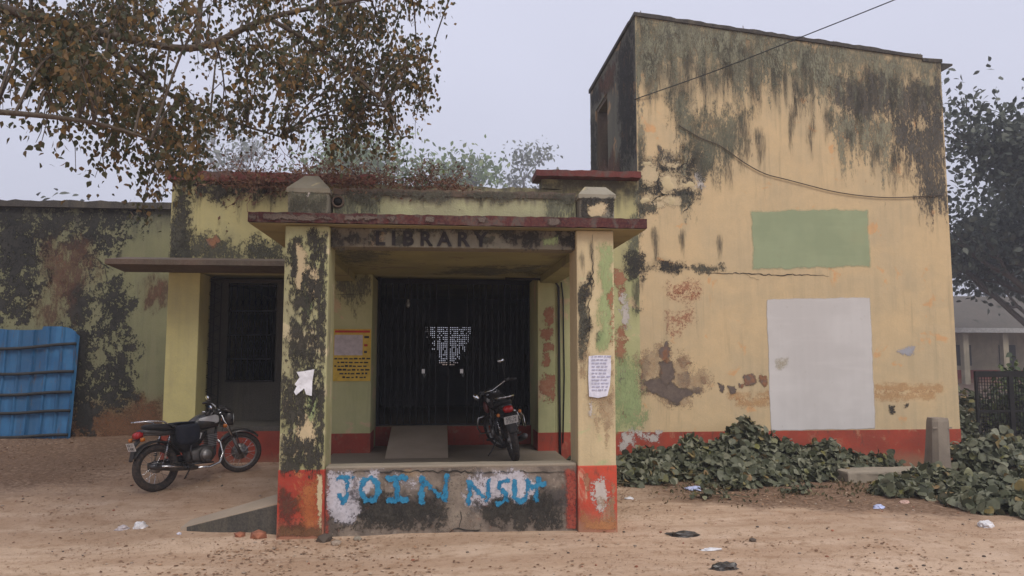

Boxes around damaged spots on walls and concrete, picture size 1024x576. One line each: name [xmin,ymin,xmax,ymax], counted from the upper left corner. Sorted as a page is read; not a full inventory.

leakage [590,17,948,224]
leakage [622,230,725,314]
crack [717,272,825,280]
leakage [0,207,164,437]
leakage [169,181,615,479]
peeling [539,306,556,404]
flaking render [596,244,770,406]
peeling [618,427,662,451]
peeling [297,474,323,537]
leakage [277,488,451,537]
leakage [474,487,566,531]